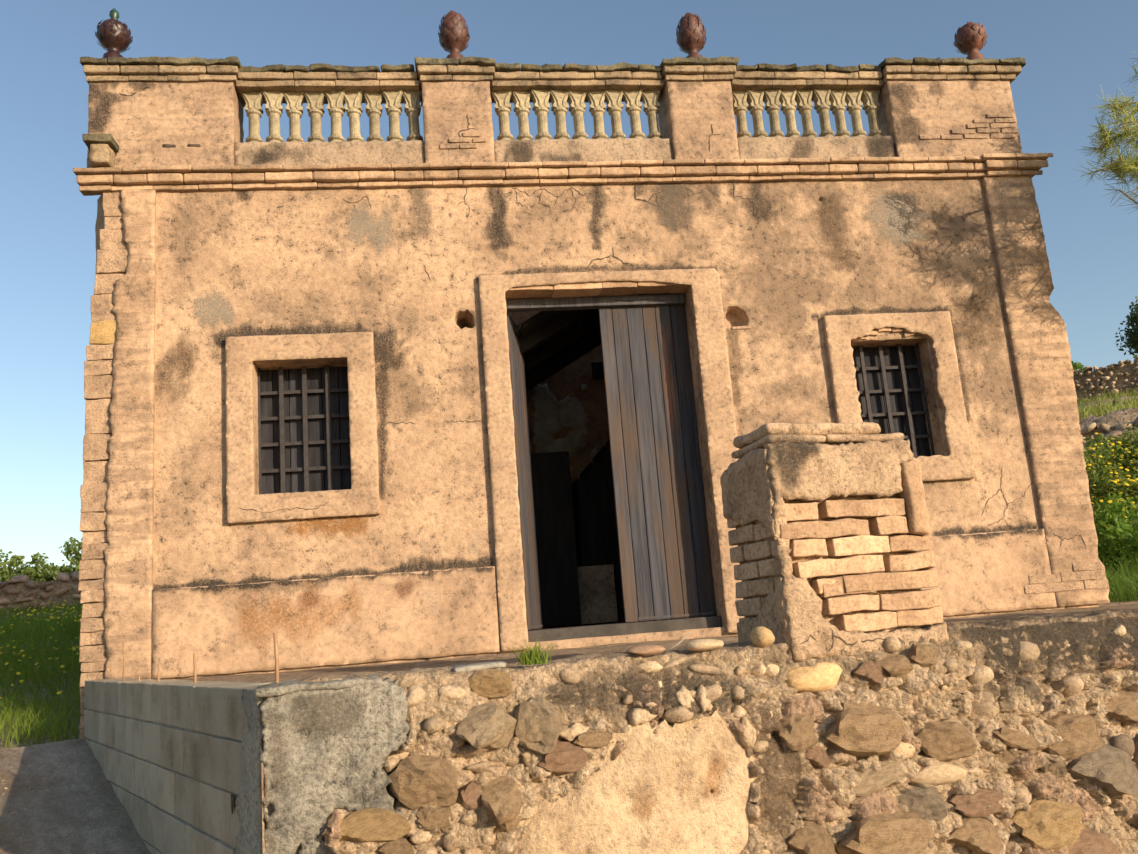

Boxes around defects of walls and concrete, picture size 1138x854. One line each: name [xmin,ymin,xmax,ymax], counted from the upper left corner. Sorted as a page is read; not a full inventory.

leakage [487,186,511,247]
leakage [590,185,603,249]
leakage [657,183,709,231]
leakage [215,321,401,499]
leakage [775,427,818,484]
crack [981,469,1031,528]
leakage [153,557,493,592]
flaking render [762,438,949,662]
leakage [963,616,1138,692]
flaking render [513,684,762,854]